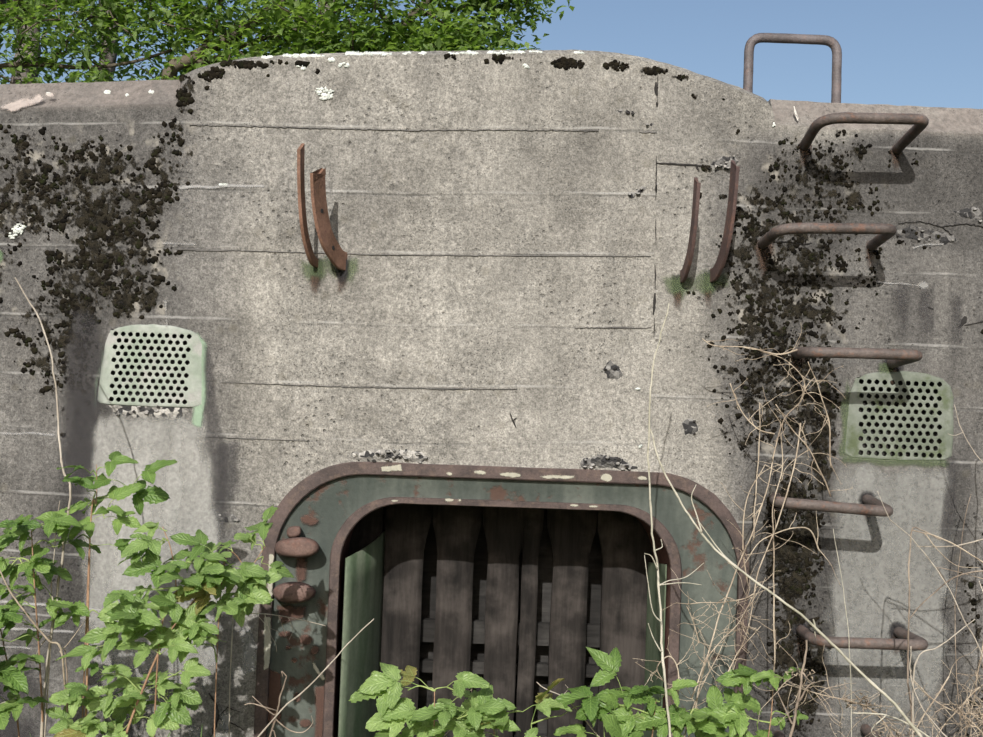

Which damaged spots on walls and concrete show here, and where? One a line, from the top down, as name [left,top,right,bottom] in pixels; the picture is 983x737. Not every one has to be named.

water stain [85,416,220,677]
water stain [831,456,949,707]
rust [277,605,319,663]
rust [268,670,281,724]
rust [300,686,325,737]